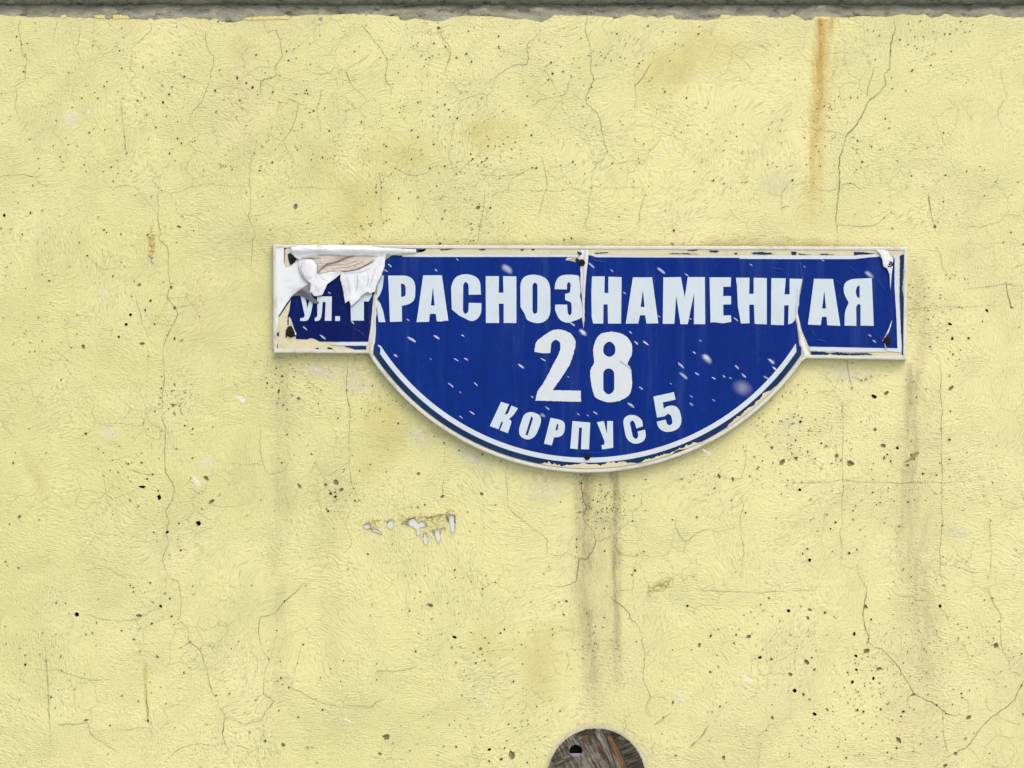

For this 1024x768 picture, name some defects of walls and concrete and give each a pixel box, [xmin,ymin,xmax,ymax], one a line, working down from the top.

crack [835,77,886,226]
peeling [363,506,458,545]
crack [863,596,950,715]